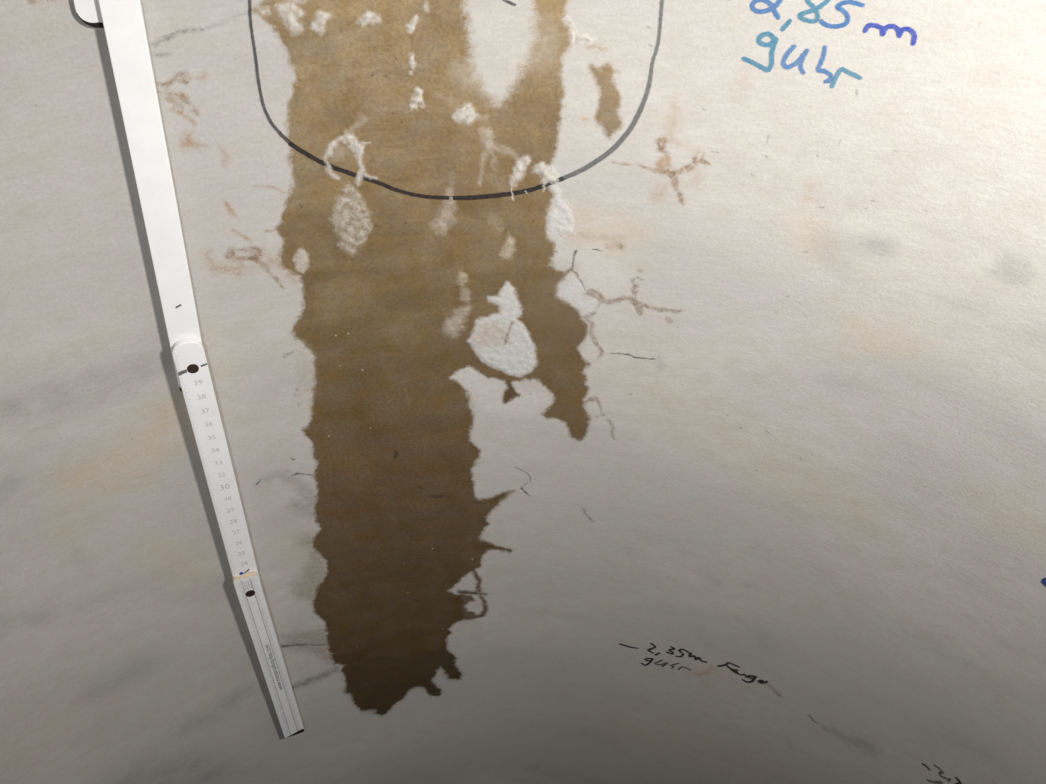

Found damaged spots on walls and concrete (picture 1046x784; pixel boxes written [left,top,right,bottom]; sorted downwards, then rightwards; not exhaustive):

water stain [253,0,596,715]
crack [569,251,681,359]